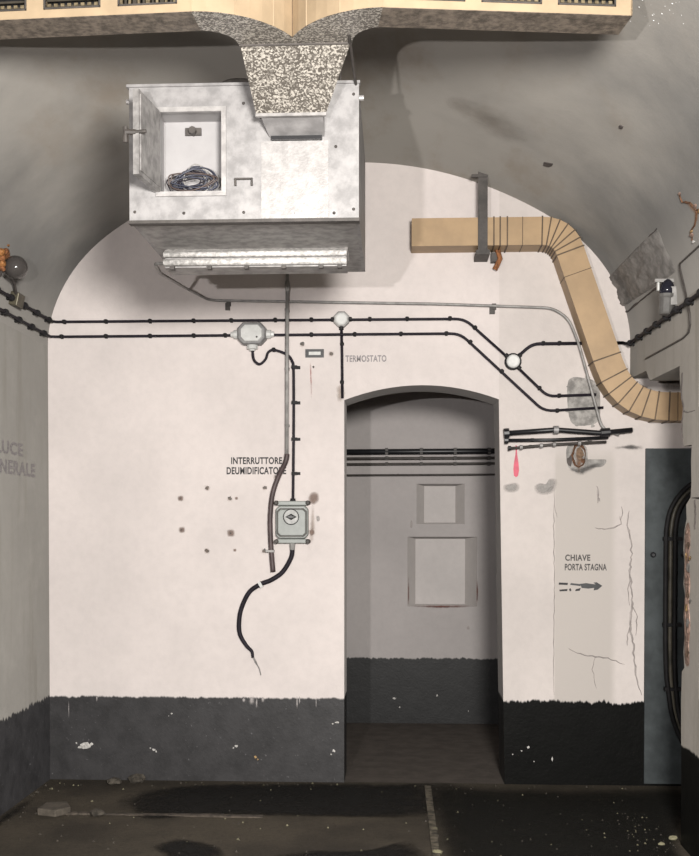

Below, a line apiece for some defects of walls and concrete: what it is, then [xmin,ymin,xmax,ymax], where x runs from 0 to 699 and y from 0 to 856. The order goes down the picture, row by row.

crack [553,497,642,695]
water stain [132,784,681,856]